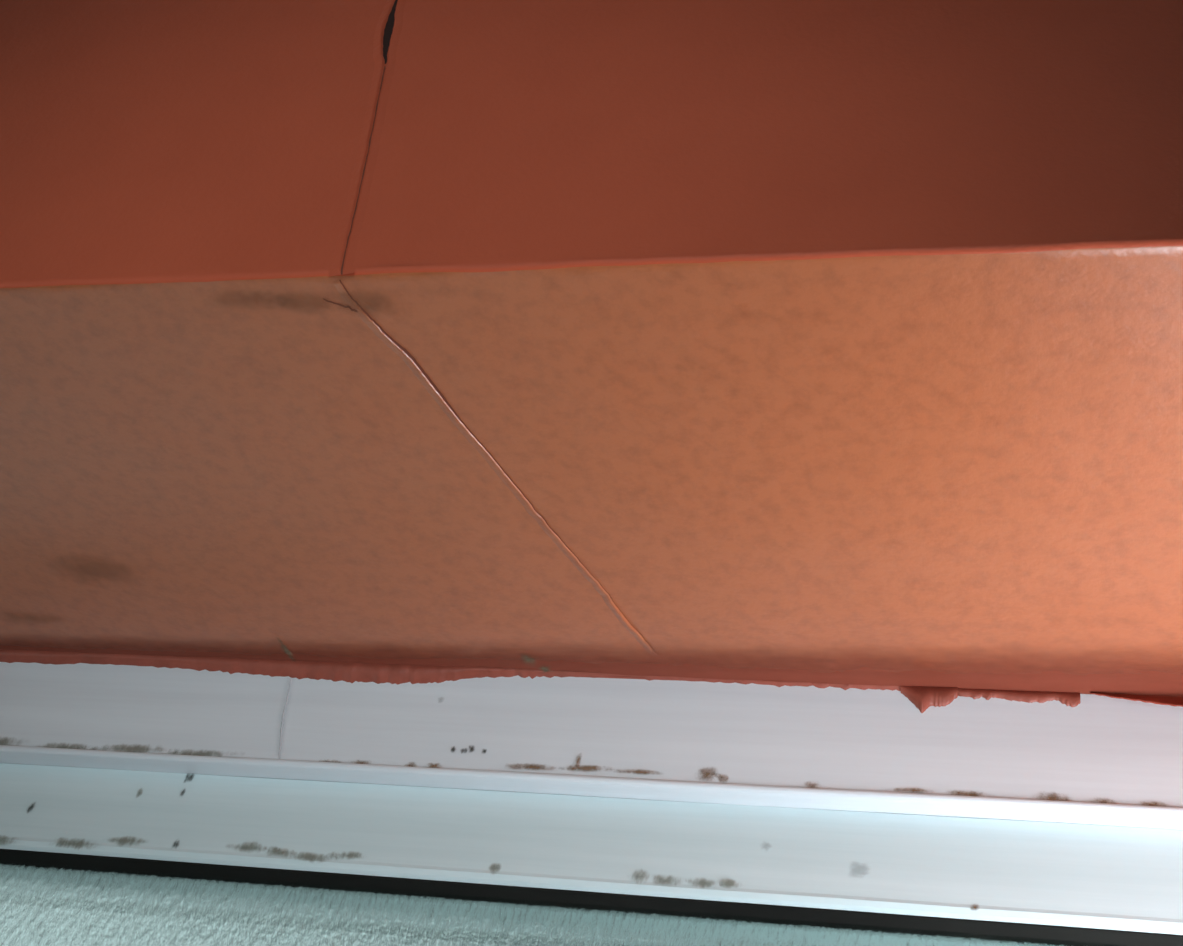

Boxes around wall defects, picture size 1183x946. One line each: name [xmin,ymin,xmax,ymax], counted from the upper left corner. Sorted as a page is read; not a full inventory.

crack [323,0,658,656]
peeling [1090,692,1183,707]
corrosion [570,757,598,771]